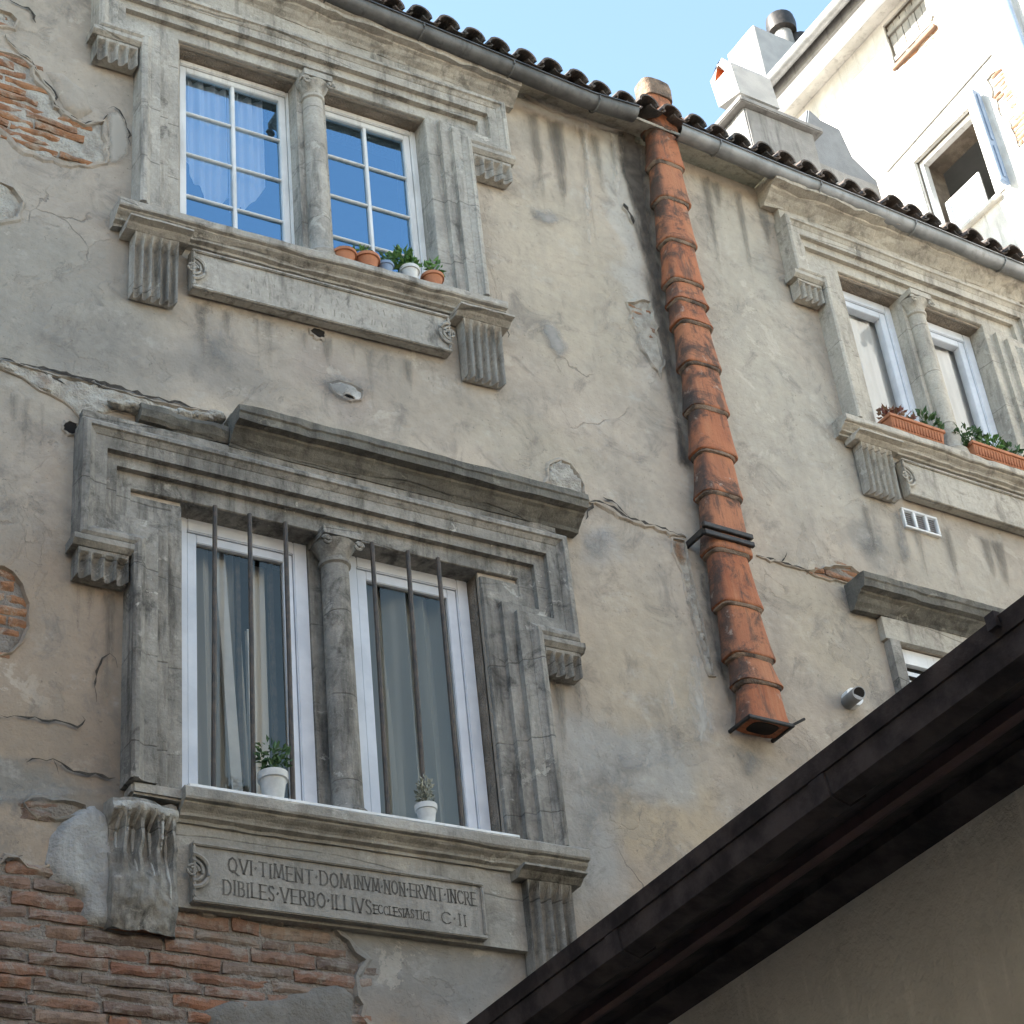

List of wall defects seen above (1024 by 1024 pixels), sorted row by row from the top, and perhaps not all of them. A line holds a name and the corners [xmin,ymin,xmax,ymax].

flaking render [0,48,111,169]
flaking render [625,298,666,380]
flaking render [0,360,208,437]
flaking render [543,457,588,494]
crack [756,553,809,572]
flaking render [0,565,30,659]
crack [1,653,118,729]
crack [26,758,113,779]
flaking render [0,853,378,1024]